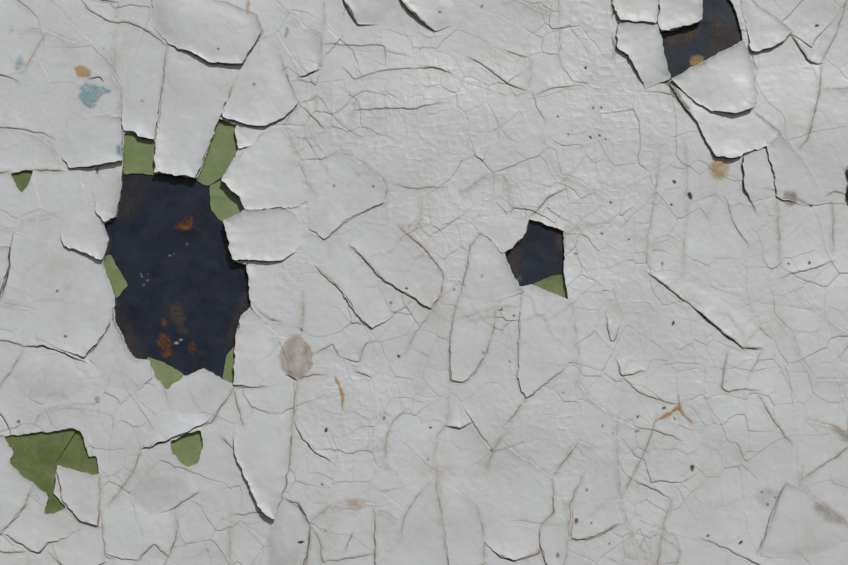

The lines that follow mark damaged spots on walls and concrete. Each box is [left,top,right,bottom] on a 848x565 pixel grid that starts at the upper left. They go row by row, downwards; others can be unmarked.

peeling [612,0,826,205]
peeling [12,170,33,192]
crack [34,345,82,361]
peeling [35,0,385,467]
peeling [317,229,443,328]
peeling [450,214,575,397]
crack [694,308,737,343]
peeling [0,428,176,565]